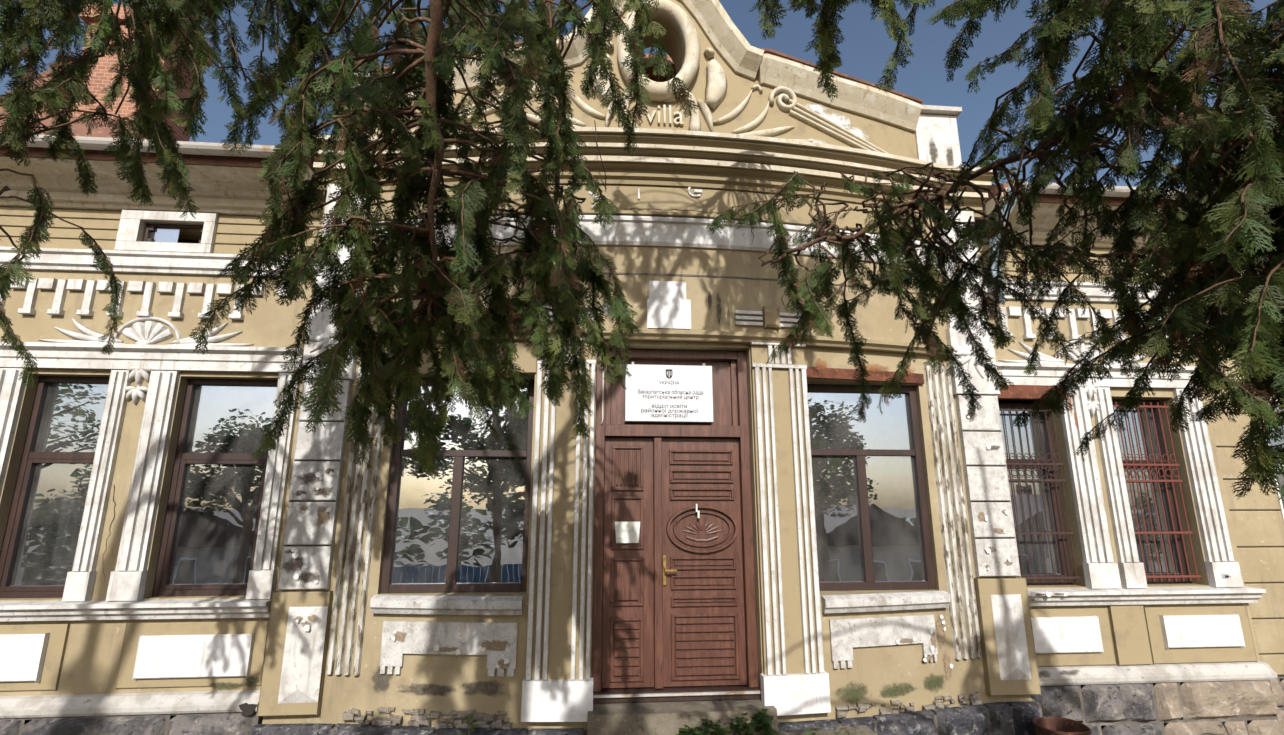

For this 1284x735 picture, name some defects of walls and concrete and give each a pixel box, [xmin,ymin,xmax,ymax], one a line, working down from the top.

peeling [296,468,335,528]
peeling [284,548,320,583]
peeling [392,630,406,642]
peeling [433,645,461,655]
peeling [481,640,509,669]
spalling [896,615,954,679]
spalling [835,692,982,719]